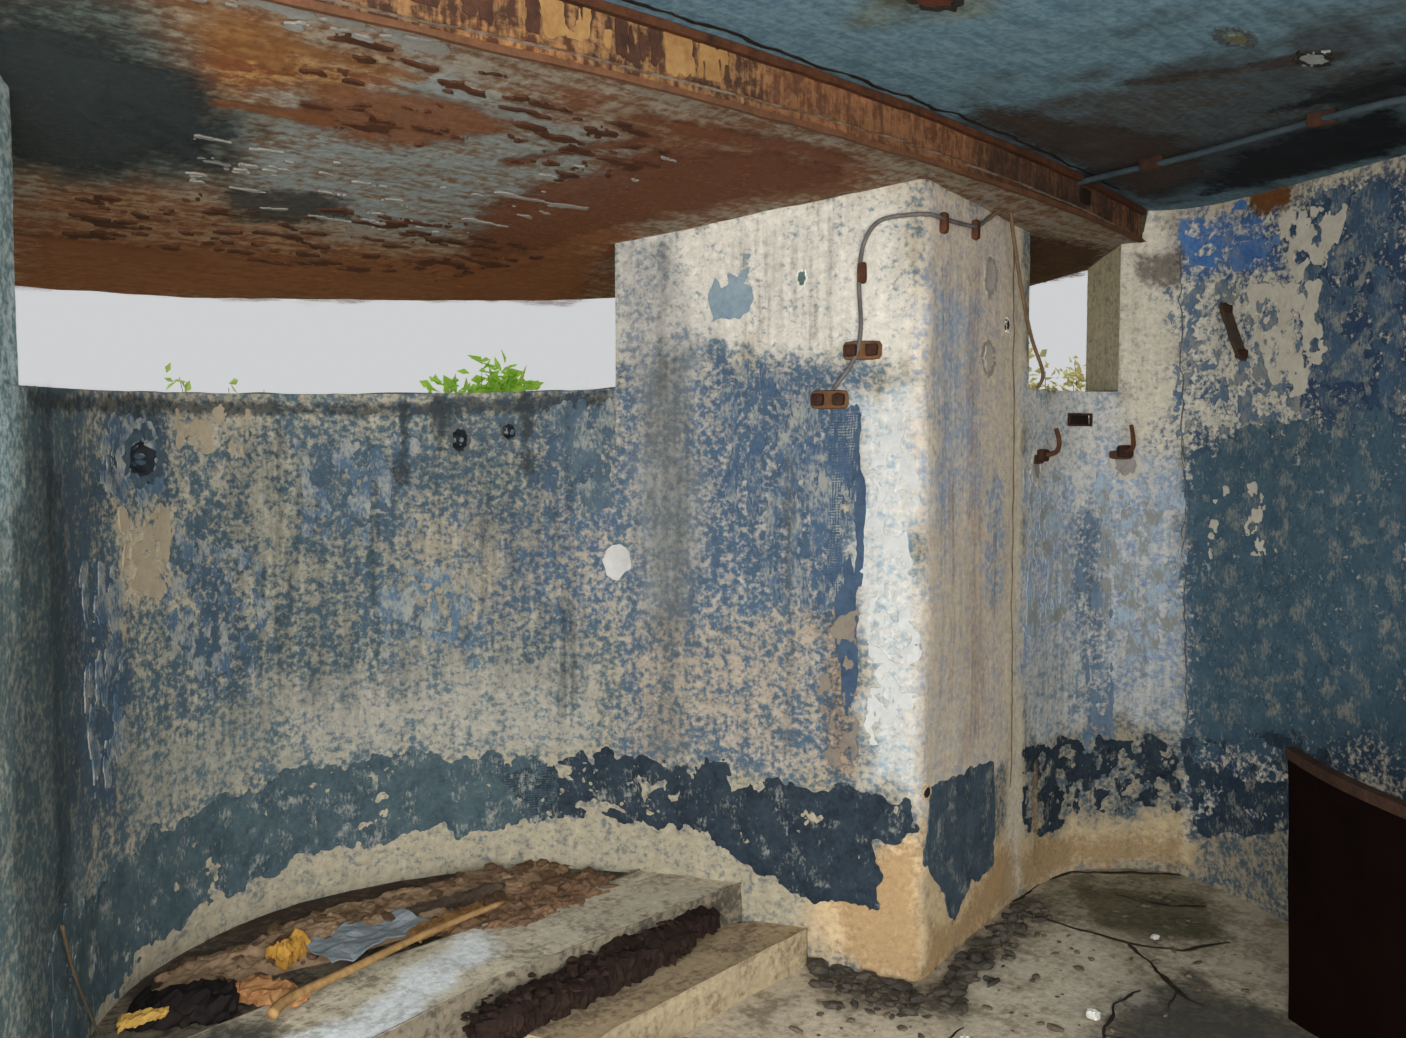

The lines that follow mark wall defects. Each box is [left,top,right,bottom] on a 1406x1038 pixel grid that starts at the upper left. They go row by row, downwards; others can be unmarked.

leakage [0,0,450,234]
rust [461,0,494,26]
rust [525,0,541,35]
rust [614,17,663,67]
rust [966,105,1210,197]
rust [1123,56,1301,86]
leakage [1199,78,1406,196]
leakage [461,164,589,233]
peeling [1162,180,1406,439]
peeling [48,358,996,1038]
crack [1012,871,1230,1038]